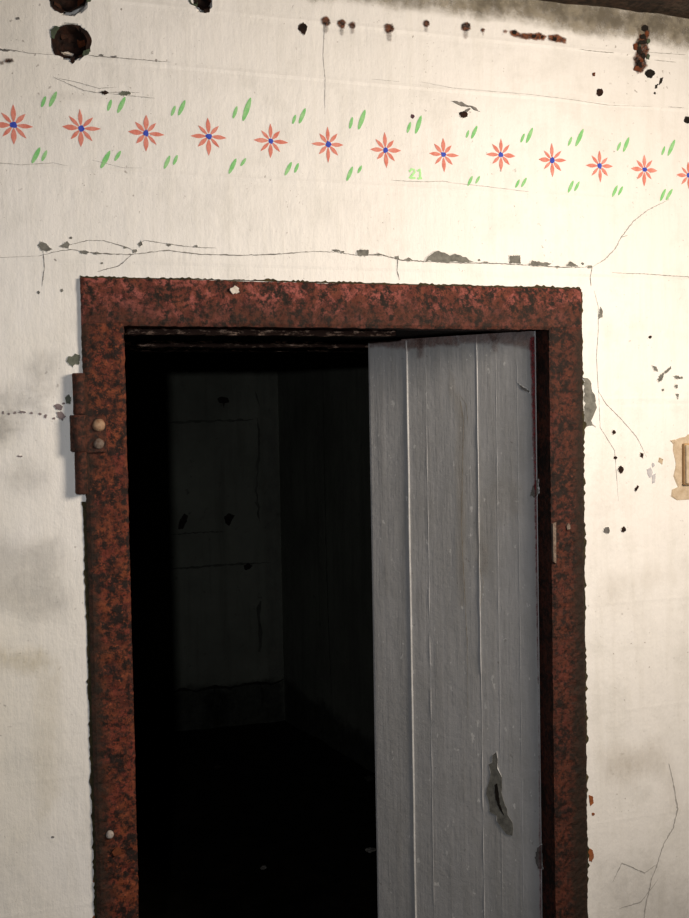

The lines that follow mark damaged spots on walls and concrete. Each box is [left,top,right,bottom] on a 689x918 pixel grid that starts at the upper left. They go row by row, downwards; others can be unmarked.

rust [322,16,356,28]
rust [504,30,566,43]
damp [382,0,689,45]
rust [633,25,655,78]
crack [0,200,688,486]
rust [370,331,537,578]
peeling [582,337,597,511]
peeling [647,458,663,484]
peeling [670,434,689,500]
peeling [585,645,595,816]
peeling [485,751,513,836]
crack [613,765,678,918]